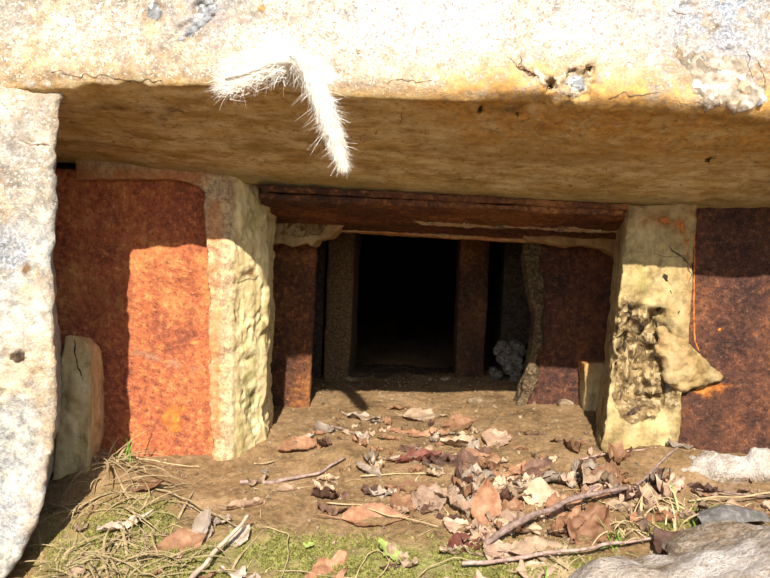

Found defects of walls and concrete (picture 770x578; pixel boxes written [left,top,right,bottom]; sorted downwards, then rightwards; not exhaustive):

spalling [532,65,594,99]
spalling [675,44,768,115]
crack [74,340,83,380]
spalling [612,296,680,424]
corrosion [695,384,724,396]